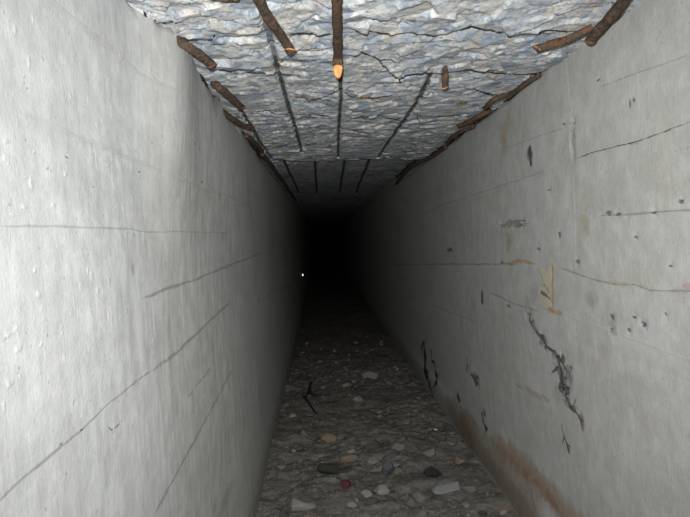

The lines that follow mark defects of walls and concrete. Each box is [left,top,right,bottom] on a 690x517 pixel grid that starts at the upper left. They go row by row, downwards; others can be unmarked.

spalling [176,35,216,69]
crack [221,57,325,76]
spalling [253,0,296,54]
spalling [331,0,343,79]
crack [356,21,438,37]
crack [354,52,543,86]
crack [462,26,566,38]
spalling [532,0,632,52]
spalling [210,80,297,201]
crack [251,89,515,179]
spalling [395,73,542,185]
crack [529,319,583,422]